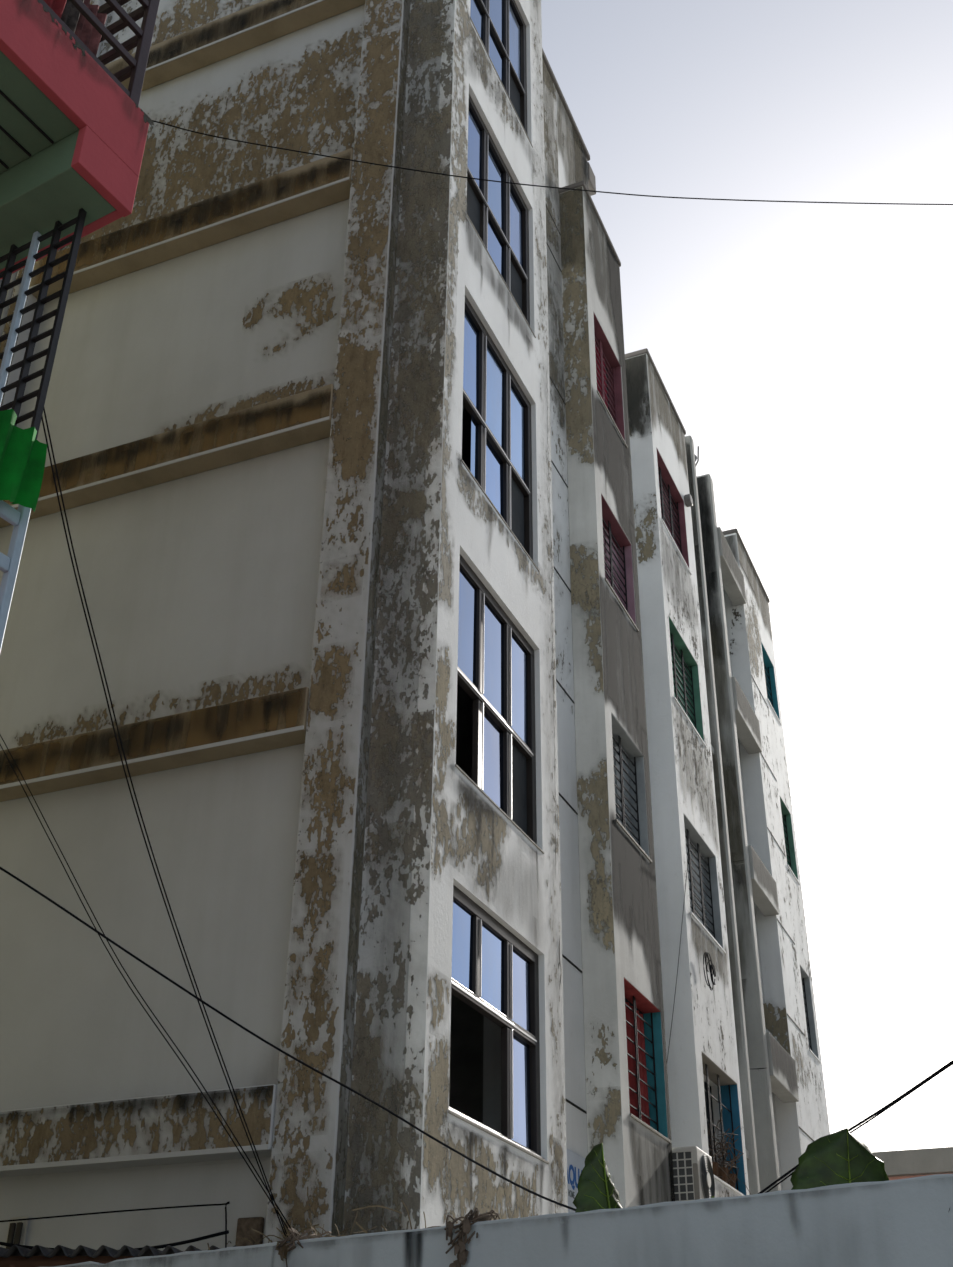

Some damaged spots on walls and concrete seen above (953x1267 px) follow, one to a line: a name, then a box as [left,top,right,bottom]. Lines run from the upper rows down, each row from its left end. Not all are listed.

damp [54,442,146,478]
peeling [0,0,604,1241]
damp [543,64,779,1205]
damp [460,781,494,854]
peeling [577,760,615,954]
damp [453,1125,480,1192]